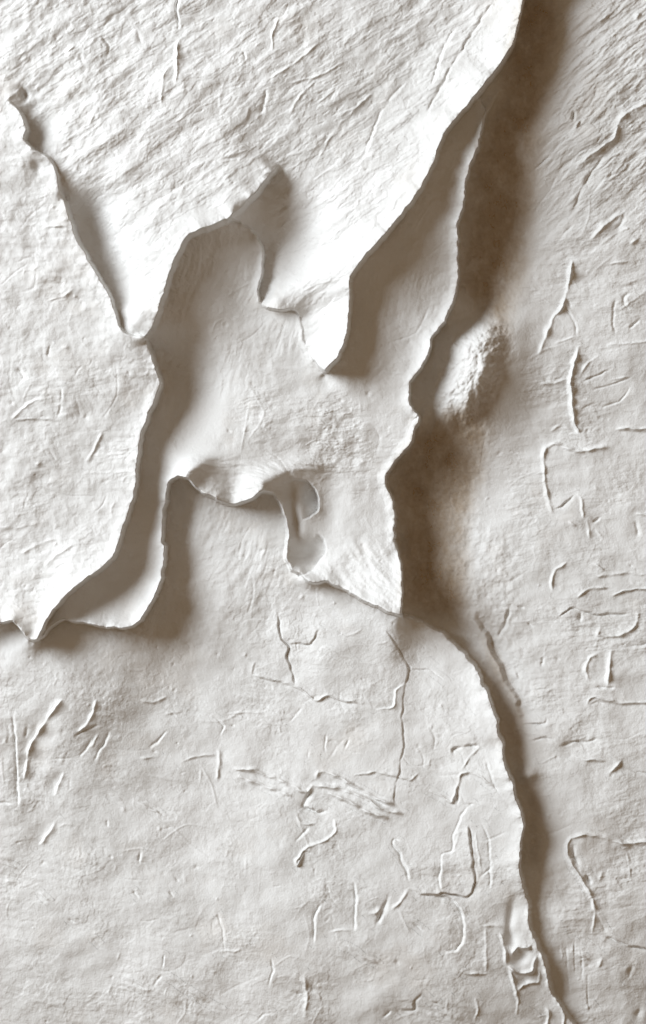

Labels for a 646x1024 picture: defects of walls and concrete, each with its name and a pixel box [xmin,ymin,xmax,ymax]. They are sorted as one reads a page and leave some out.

flaking render [0,0,525,647]
crack [369,625,509,957]
crack [517,711,603,752]
crack [379,988,443,1023]